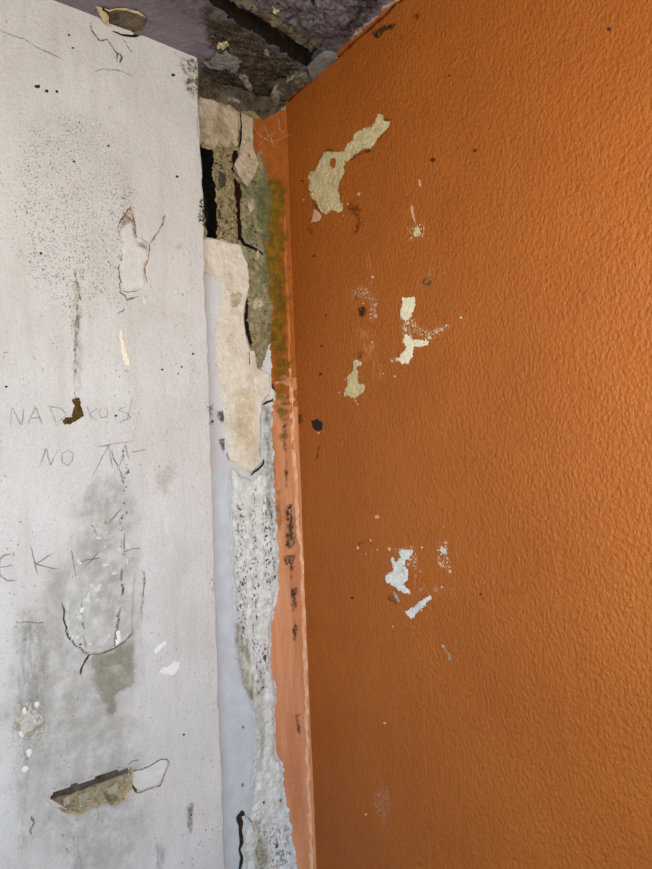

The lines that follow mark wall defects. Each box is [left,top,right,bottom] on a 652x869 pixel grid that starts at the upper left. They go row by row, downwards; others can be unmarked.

peeling [96,6,147,37]
spalling [268,0,399,39]
damp [171,59,200,91]
spalling [202,8,338,103]
peeling [303,114,391,233]
flaking render [198,97,277,476]
peeling [391,297,447,364]
peeling [338,359,365,405]
peeling [370,539,423,603]
peeling [405,586,443,618]
spalling [48,767,134,819]